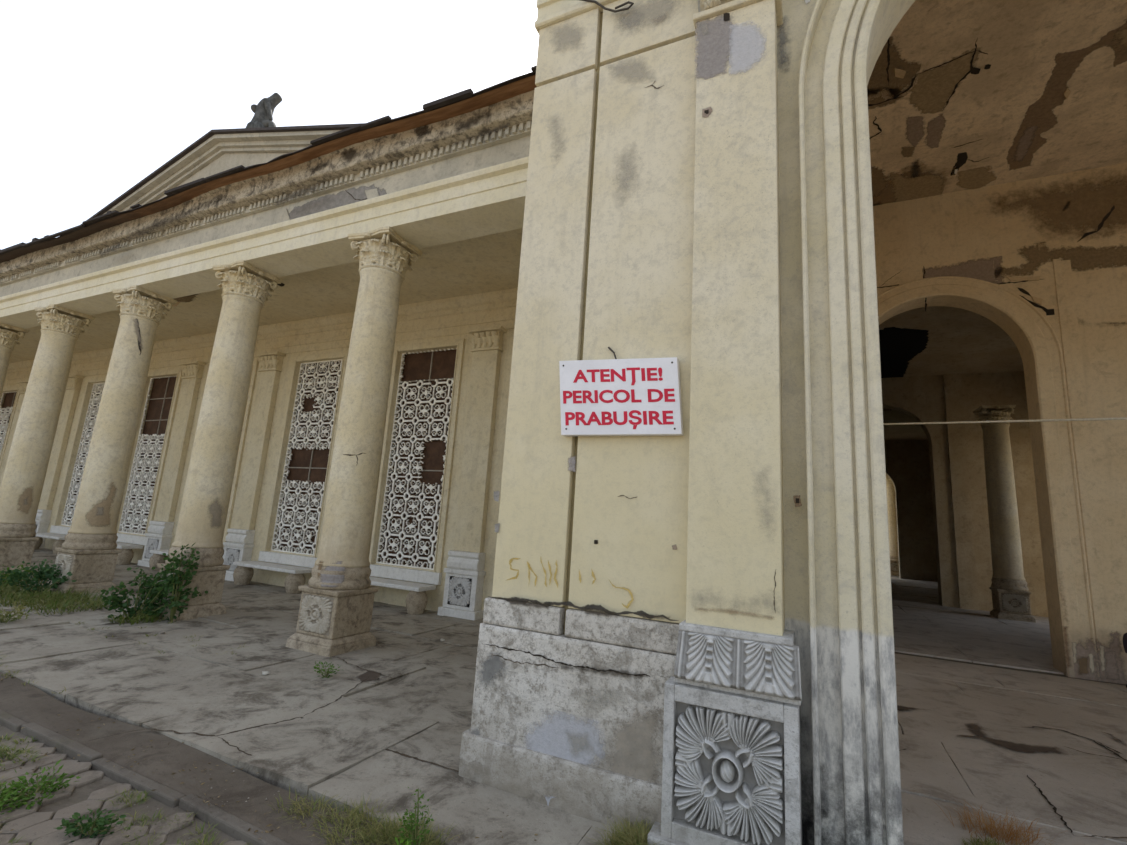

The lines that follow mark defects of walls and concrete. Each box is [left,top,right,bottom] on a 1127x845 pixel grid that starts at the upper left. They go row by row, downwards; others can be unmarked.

flaking render [695,13,766,79]
flaking render [867,37,991,157]
flaking render [1006,20,1127,171]
flaking render [871,166,996,202]
leakage [994,176,1127,242]
flaking render [922,242,1127,284]
peeling [86,483,116,527]
crack [486,644,662,677]
leakage [959,724,1064,754]
crack [1027,775,1127,838]